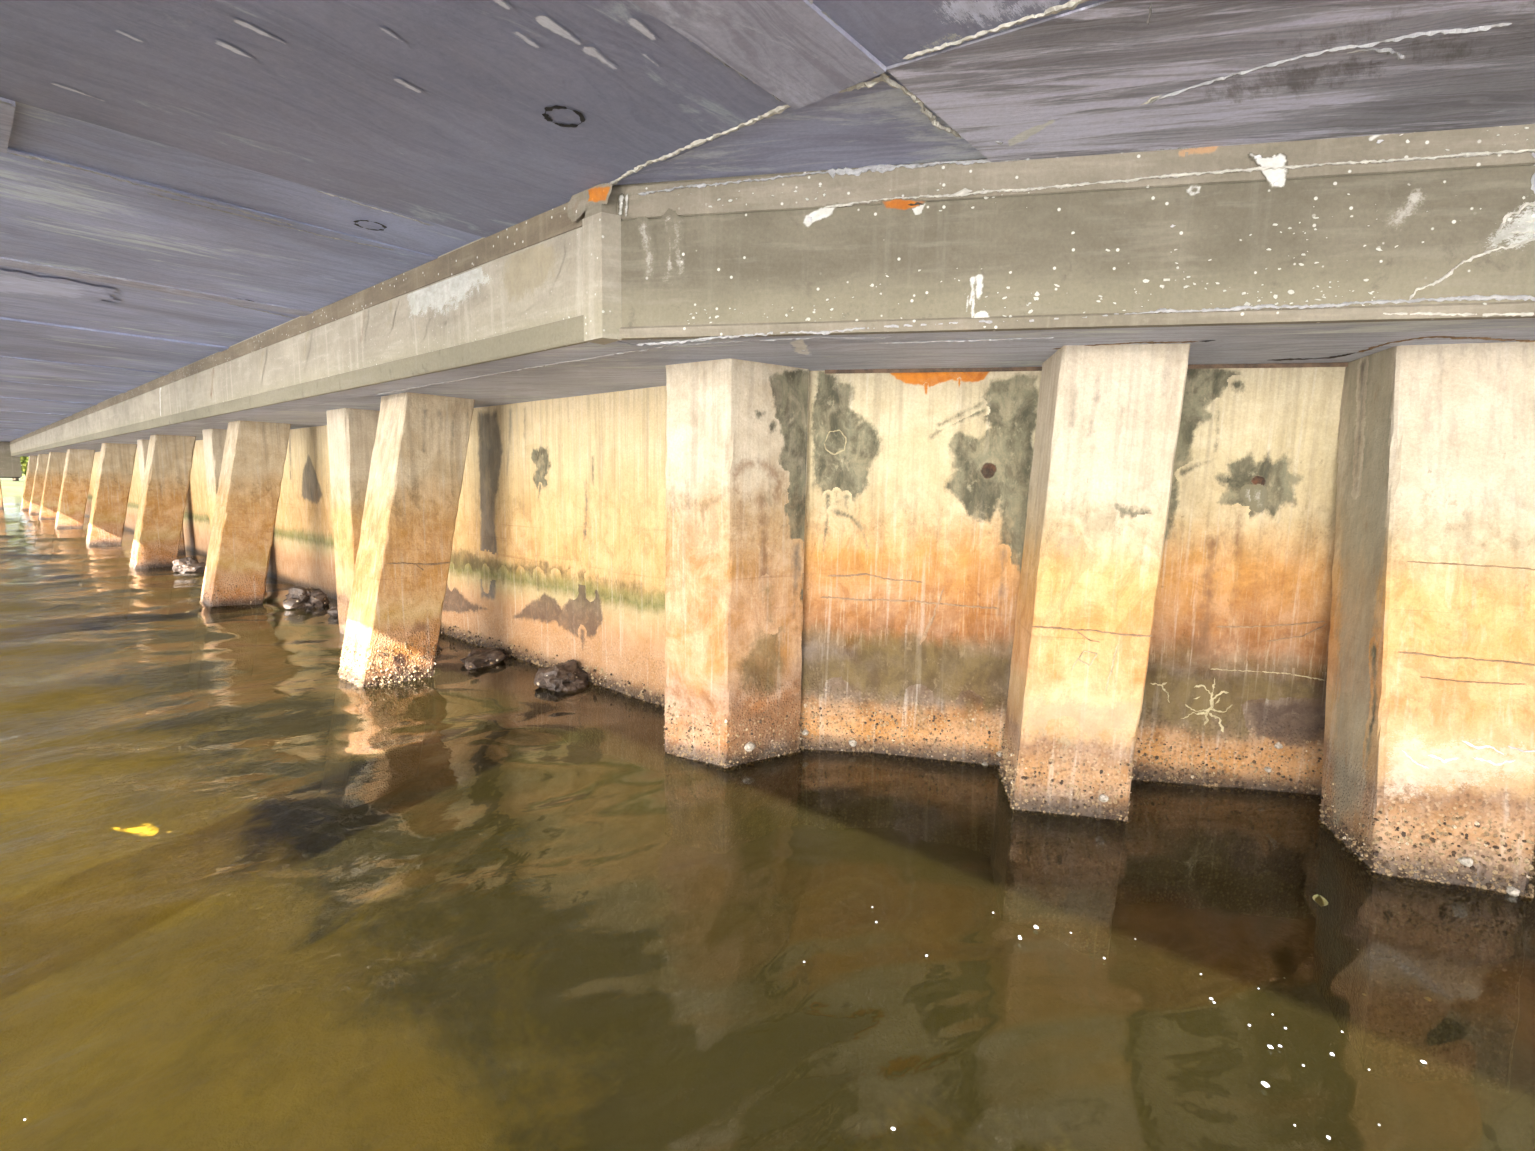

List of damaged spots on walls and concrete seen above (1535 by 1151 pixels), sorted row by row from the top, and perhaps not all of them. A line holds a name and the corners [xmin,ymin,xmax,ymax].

water stain [610,40,790,186]
water stain [839,71,961,138]
water stain [900,0,1106,60]
crack [1141,23,1512,105]
water stain [639,117,1059,195]
water stain [825,149,1535,208]
crack [1409,152,1535,300]
rust [889,372,990,396]
water stain [377,318,1059,555]
water stain [925,371,1042,622]
water stain [1154,368,1311,613]